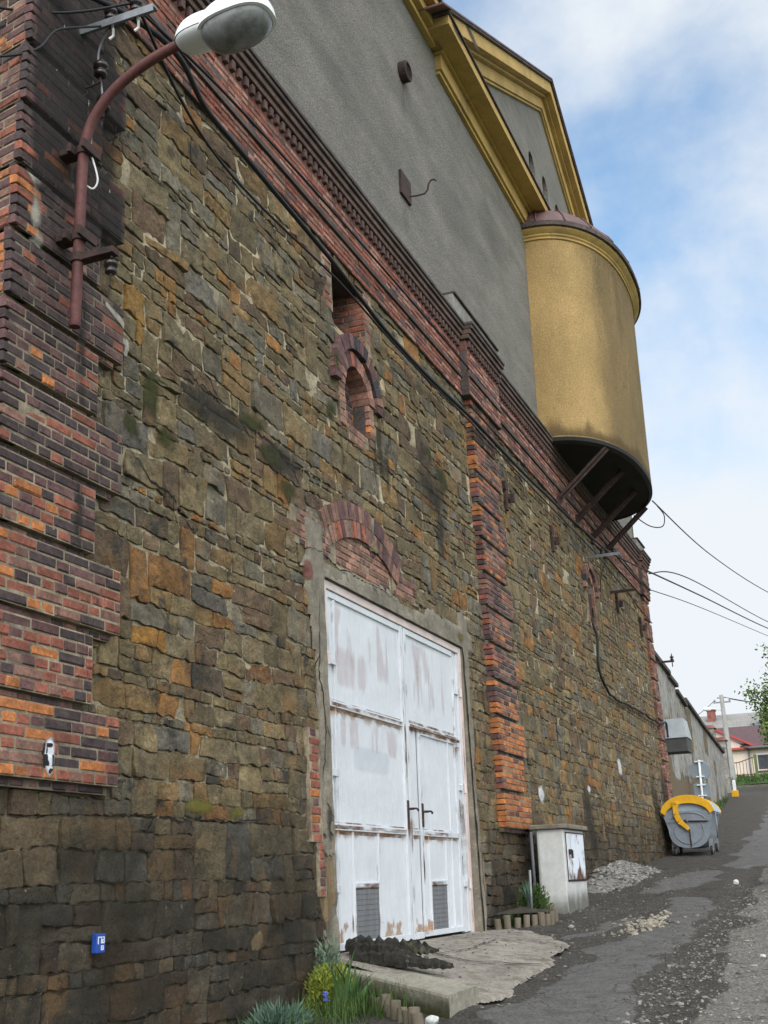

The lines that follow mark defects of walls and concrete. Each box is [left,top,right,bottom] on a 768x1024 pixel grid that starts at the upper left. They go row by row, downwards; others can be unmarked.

crack [313,593,330,787]
rust [379,921,402,937]
rust [417,921,434,932]